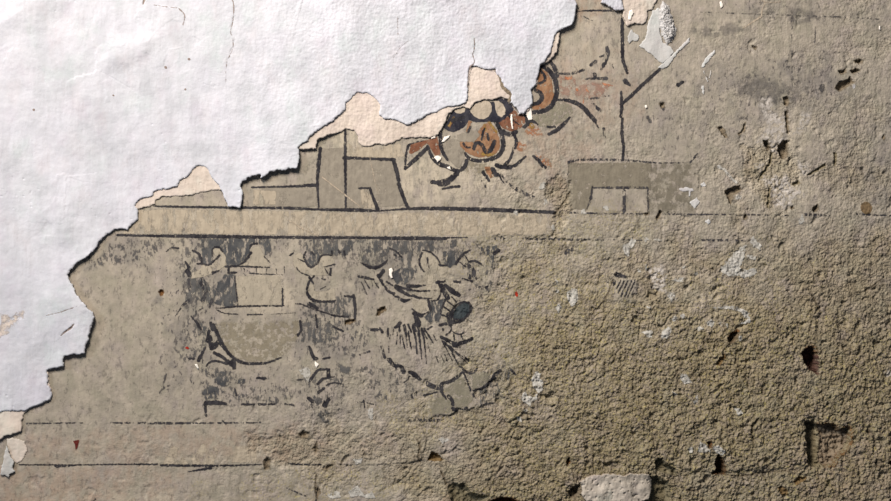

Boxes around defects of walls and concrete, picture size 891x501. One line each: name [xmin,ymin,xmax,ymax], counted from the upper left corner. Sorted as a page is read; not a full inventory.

peeling [600,0,690,69]
peeling [0,0,578,477]
peeling [623,237,662,256]
peeling [642,314,685,339]